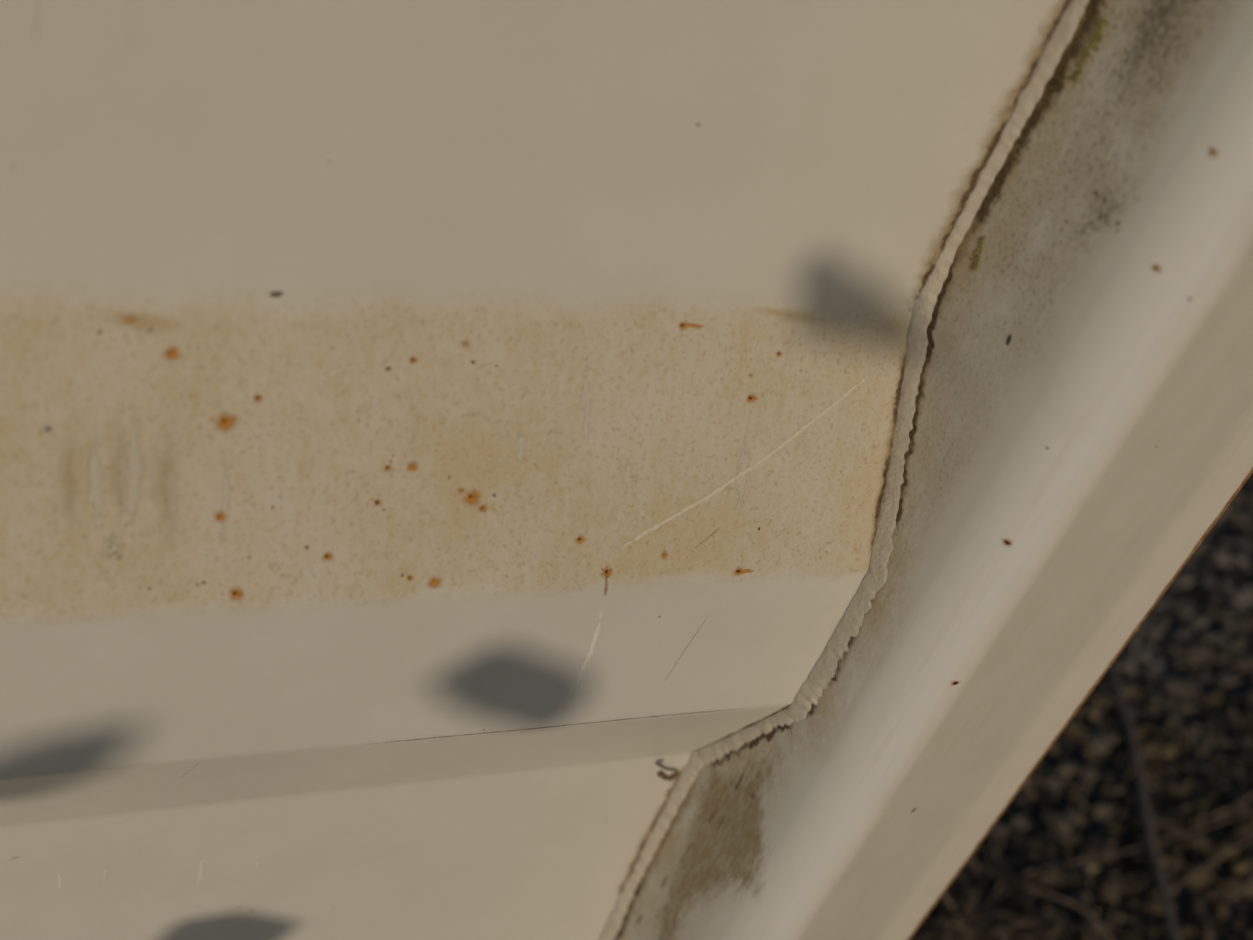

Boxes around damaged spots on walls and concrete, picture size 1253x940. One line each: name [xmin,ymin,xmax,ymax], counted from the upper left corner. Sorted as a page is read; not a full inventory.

rust [219,416,234,429]
rust [459,489,496,511]
crack [831,636,853,681]